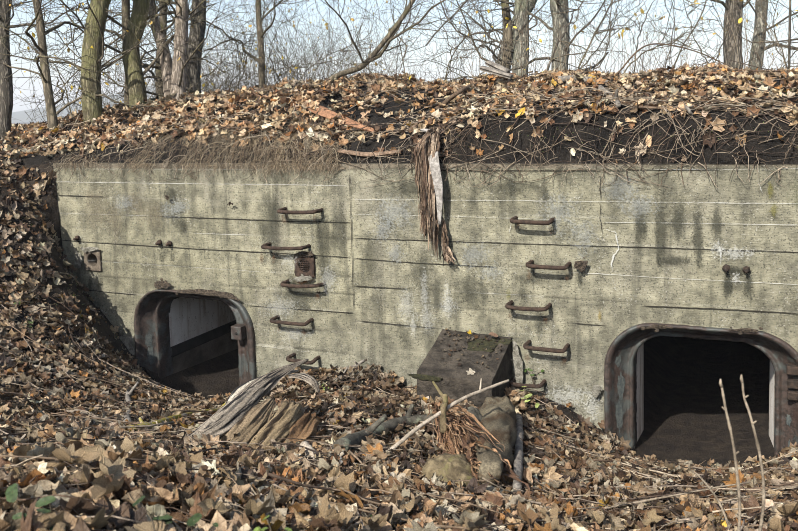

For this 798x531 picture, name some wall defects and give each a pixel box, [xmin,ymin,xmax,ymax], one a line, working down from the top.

damp [576,200,722,284]
damp [716,266,762,299]